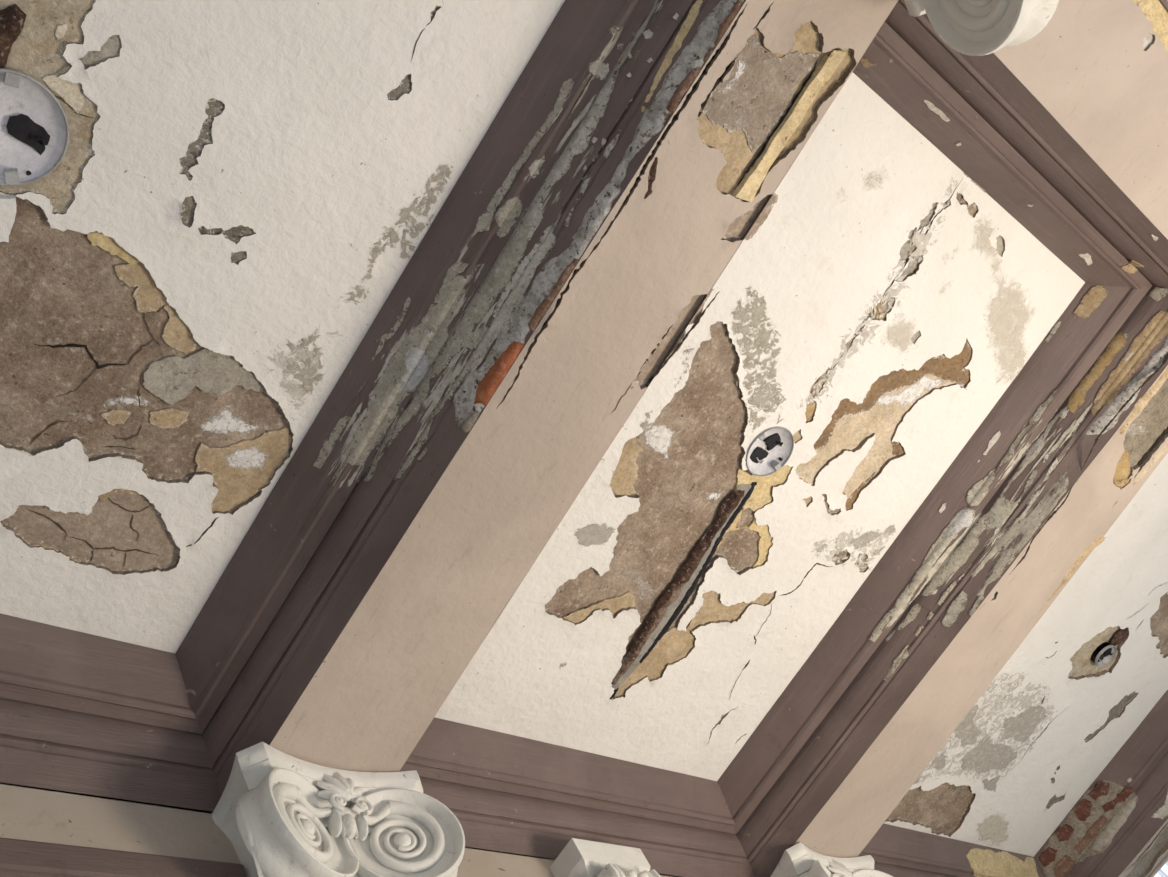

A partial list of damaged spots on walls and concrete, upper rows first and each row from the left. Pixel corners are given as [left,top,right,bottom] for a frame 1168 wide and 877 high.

peeling [1133,0,1168,52]
flaking render [697,22,874,240]
flaking render [0,0,343,513]
flaking render [312,0,744,489]
flaking render [2,488,179,572]
corrosion [611,490,745,685]
flaking render [545,173,985,696]
flaking render [868,285,1168,681]
peeling [887,673,1058,835]
flaking render [966,778,1138,877]
peeling [1046,766,1064,808]
peeling [1151,792,1168,820]